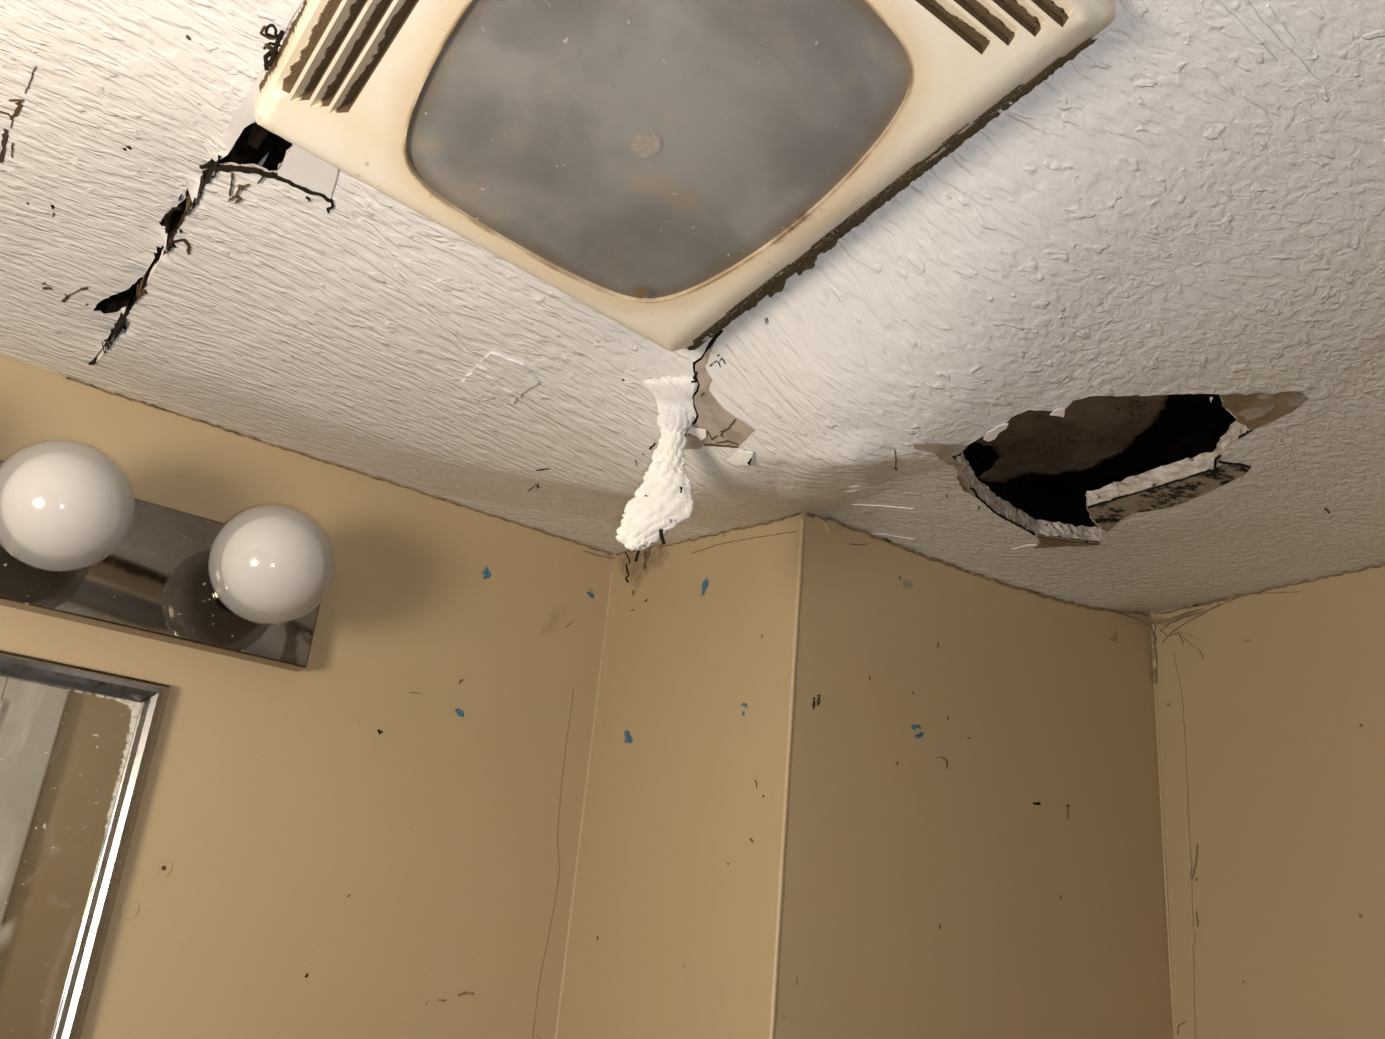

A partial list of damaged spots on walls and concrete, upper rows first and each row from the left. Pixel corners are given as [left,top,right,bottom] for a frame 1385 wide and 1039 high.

peeling [615,330,755,562]
crack [0,124,1385,624]
spalling [956,393,1306,549]